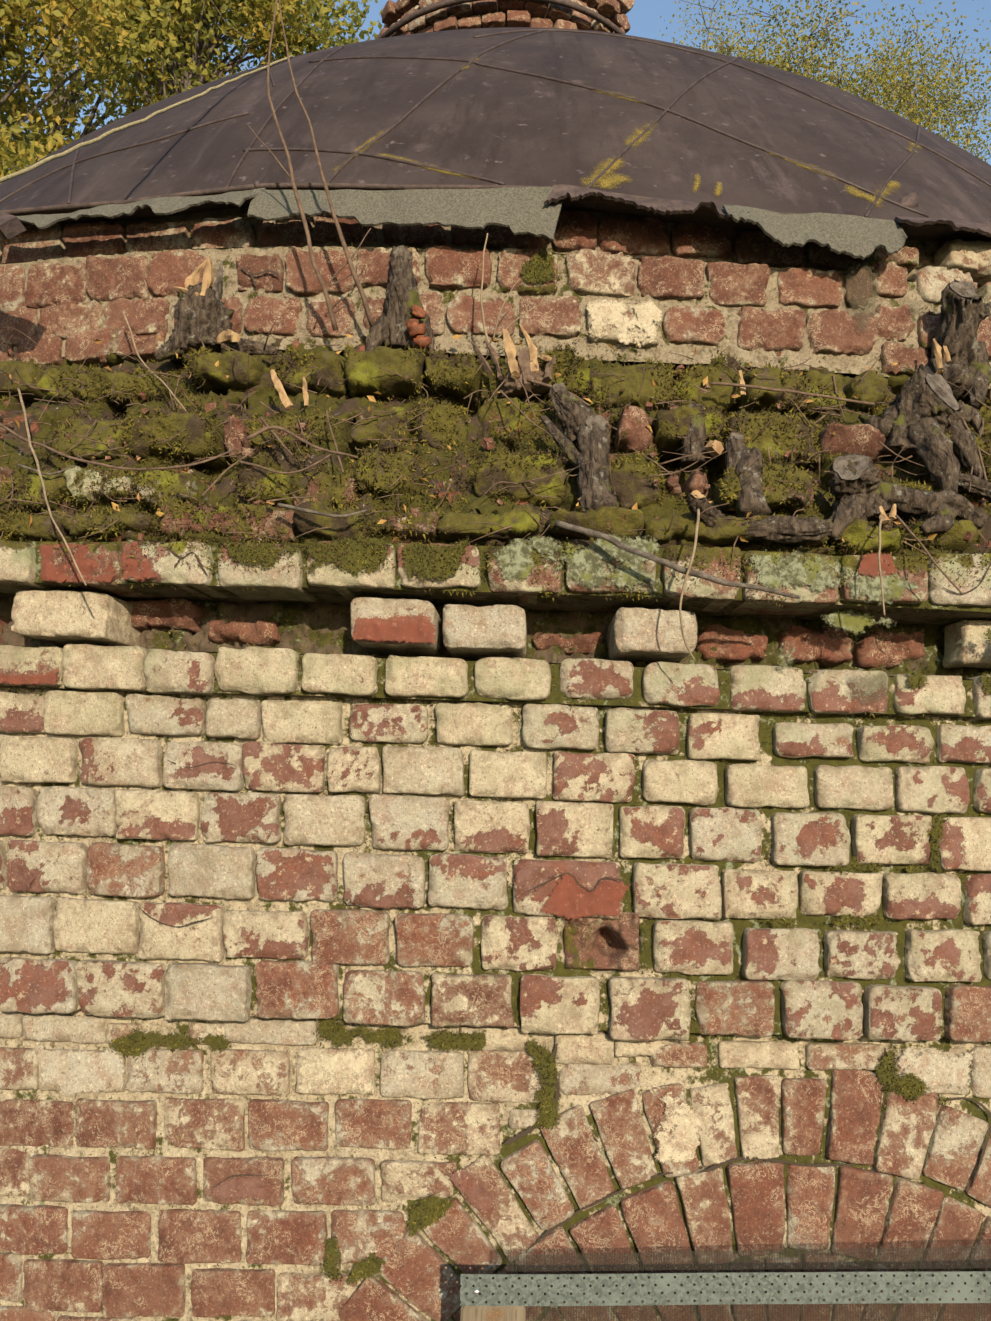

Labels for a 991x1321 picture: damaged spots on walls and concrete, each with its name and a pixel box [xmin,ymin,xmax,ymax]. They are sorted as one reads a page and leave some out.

spalling [0,661,60,686]
peeling [170,658,209,726]
peeling [0,705,44,732]
peeling [78,738,116,784]
peeling [0,790,63,894]
peeling [57,795,92,824]
peeling [116,704,428,909]
spalling [377,624,991,1041]
peeling [140,902,221,931]
peeling [223,919,309,959]
peeling [0,958,165,1018]